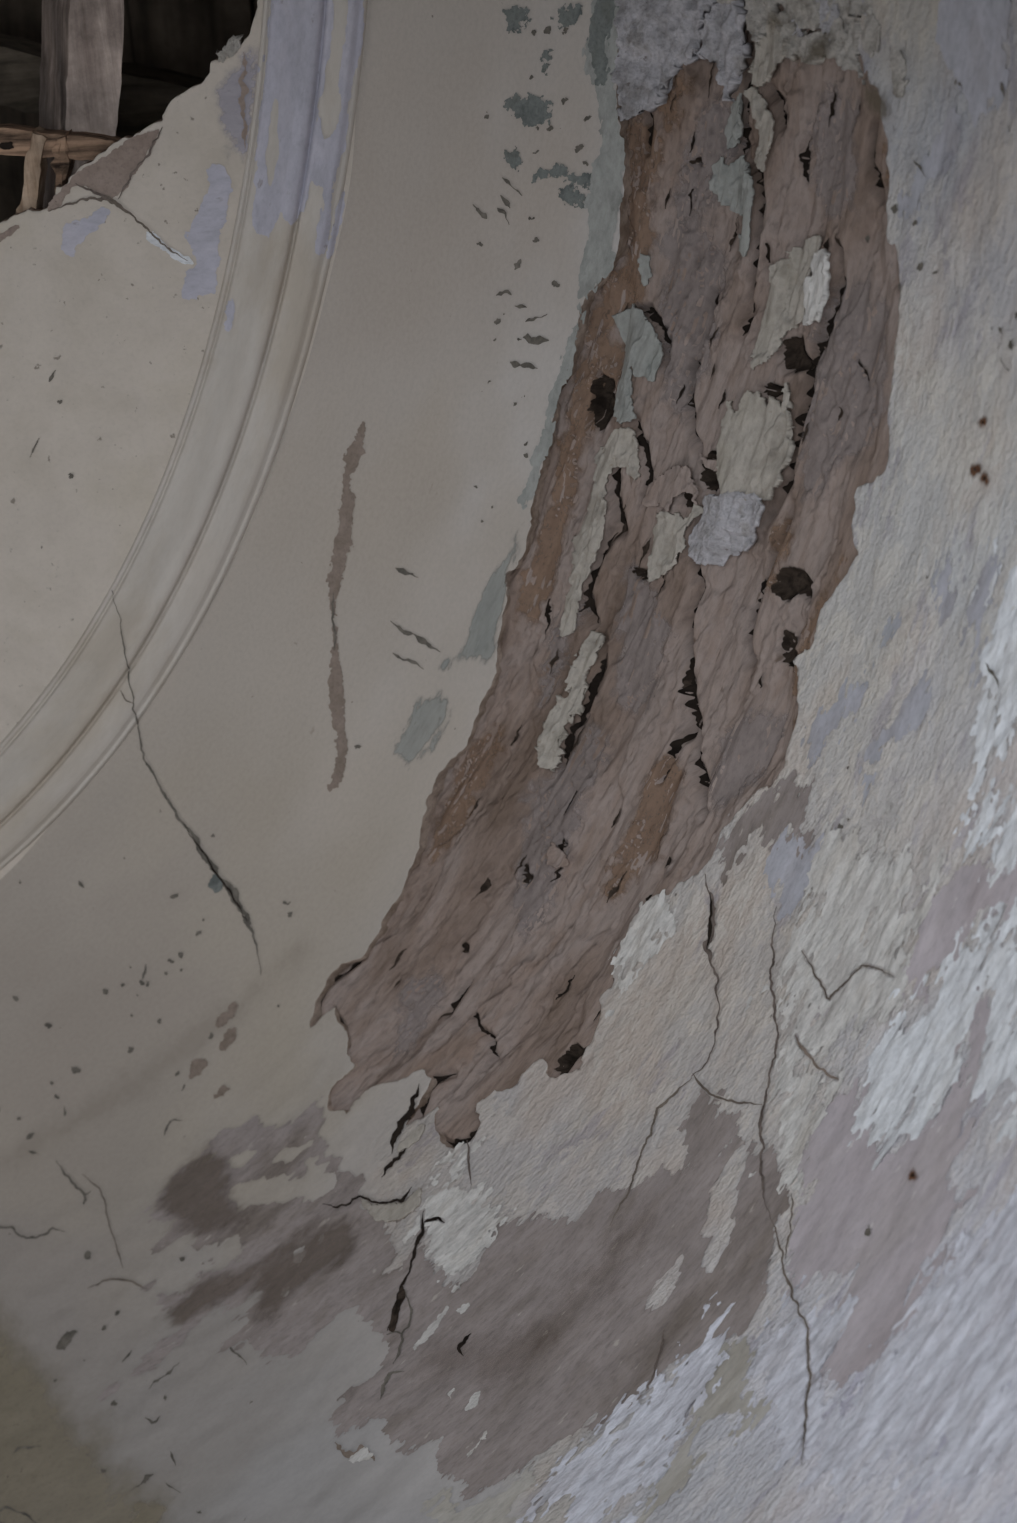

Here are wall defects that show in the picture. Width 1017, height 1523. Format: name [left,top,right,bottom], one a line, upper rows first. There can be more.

flaking render [0,225,20,242]
flaking render [47,128,162,257]
peeling [181,164,235,332]
peeling [238,0,365,259]
flaking render [316,0,902,1148]
crack [111,590,261,974]
peeling [838,669,932,829]
peeling [102,952,184,996]
crack [380,1211,445,1399]
peeling [99,986,991,1523]
crack [610,874,894,1464]